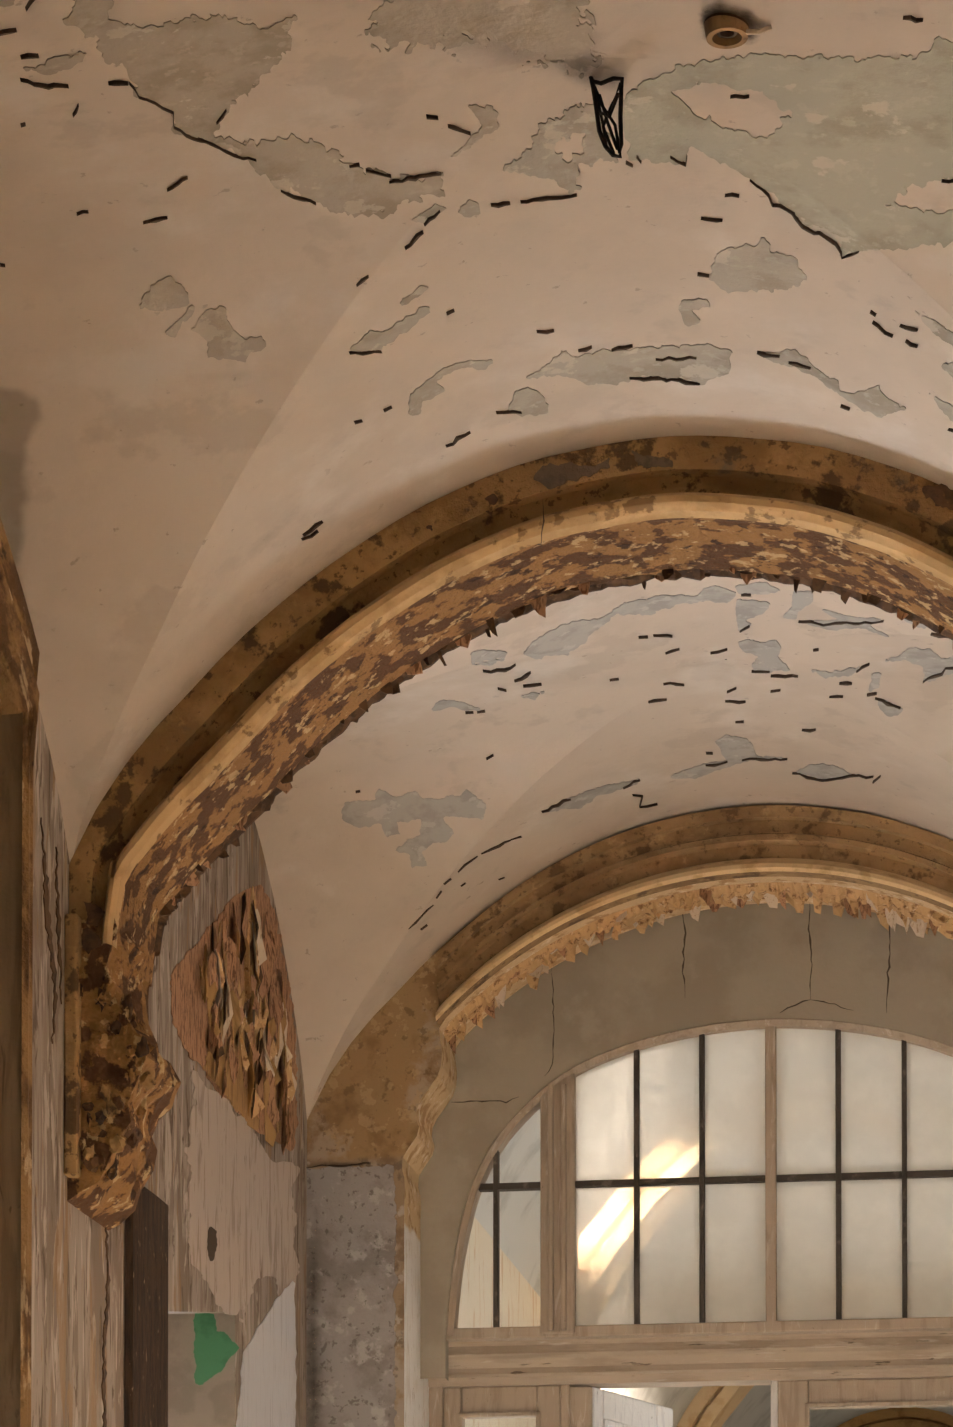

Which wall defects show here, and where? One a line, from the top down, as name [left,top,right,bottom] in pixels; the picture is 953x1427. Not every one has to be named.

peeling [20,0,953,259]
peeling [697,237,807,294]
peeling [140,275,266,362]
peeling [349,285,455,356]
peeling [496,343,732,417]
peeling [757,349,906,418]
peeling [869,310,953,377]
peeling [446,431,471,448]
peeling [301,520,323,541]
peeling [154,567,953,957]
peeling [444,882,953,1054]
peeling [170,885,398,1427]